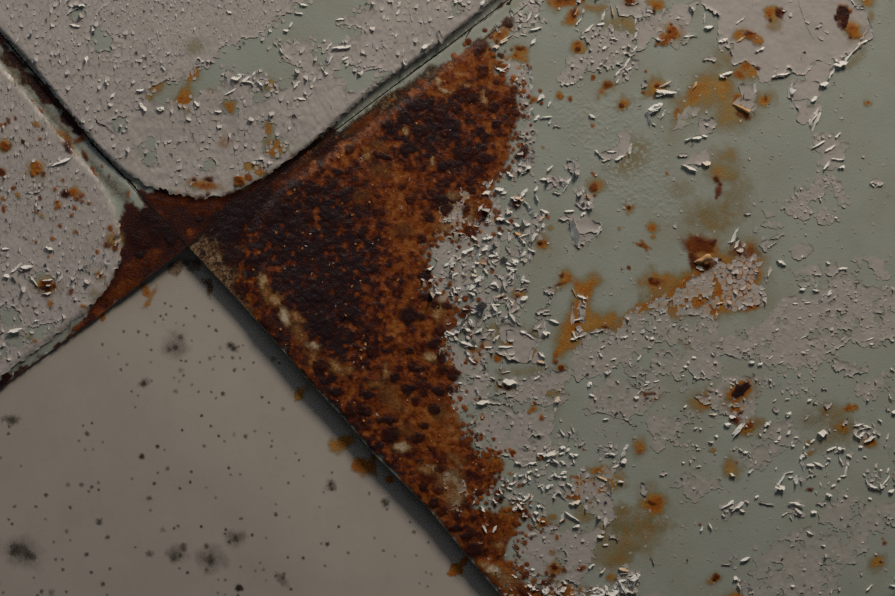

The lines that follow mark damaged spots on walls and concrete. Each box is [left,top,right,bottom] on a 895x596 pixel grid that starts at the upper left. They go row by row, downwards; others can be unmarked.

peeling [65,0,86,27]
rust [547,0,605,25]
rust [834,5,861,39]
peeling [137,0,408,111]
rust [673,56,760,126]
peeling [263,136,289,159]
peeling [0,303,55,358]
peeling [4,262,63,295]
rust [0,17,592,596]
rust [553,149,763,373]
peeling [421,0,895,596]
rust [725,380,764,435]